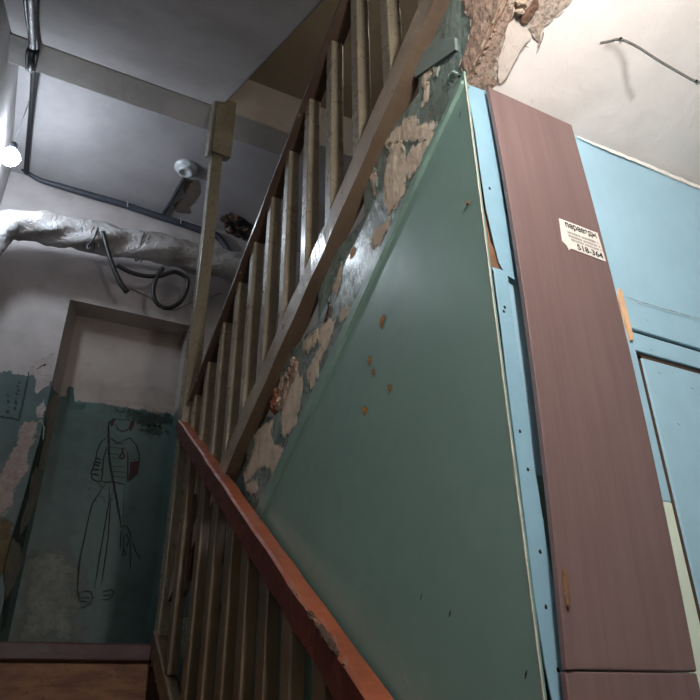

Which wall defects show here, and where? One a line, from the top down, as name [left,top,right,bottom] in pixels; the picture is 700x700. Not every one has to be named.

peeling [369,64,441,250]
spalling [447,0,572,90]
peeling [0,352,56,577]
peeling [243,262,350,495]